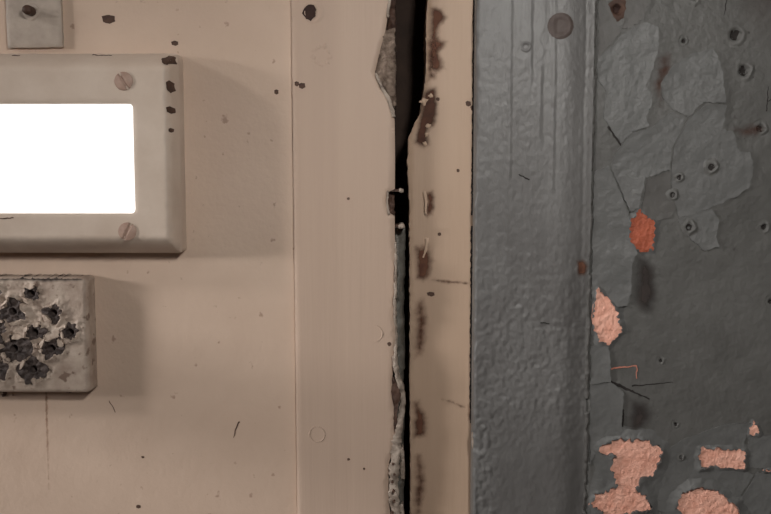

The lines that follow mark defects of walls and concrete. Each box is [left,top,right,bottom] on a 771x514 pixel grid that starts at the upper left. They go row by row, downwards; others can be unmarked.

crack [611,381,673,399]
peeling [586,0,771,514]